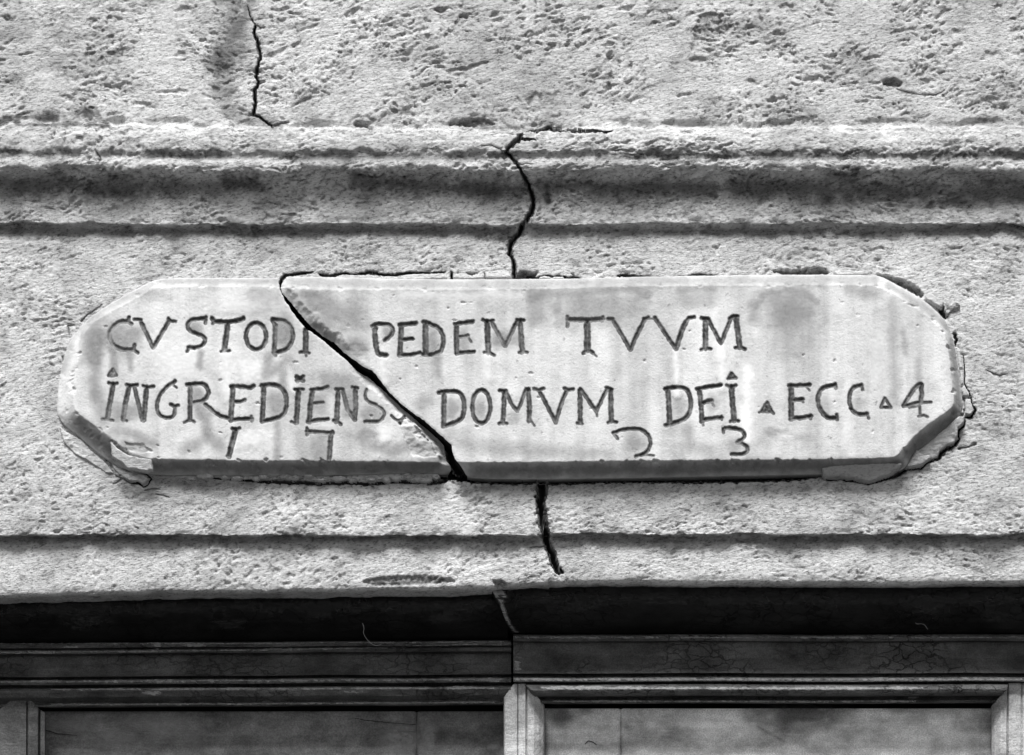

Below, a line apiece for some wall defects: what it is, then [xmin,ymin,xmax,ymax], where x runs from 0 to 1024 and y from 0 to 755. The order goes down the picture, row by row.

crack [247,6,288,128]
crack [481,126,613,279]
crack [279,271,486,330]
crack [213,334,1008,575]
spalling [905,450,930,470]